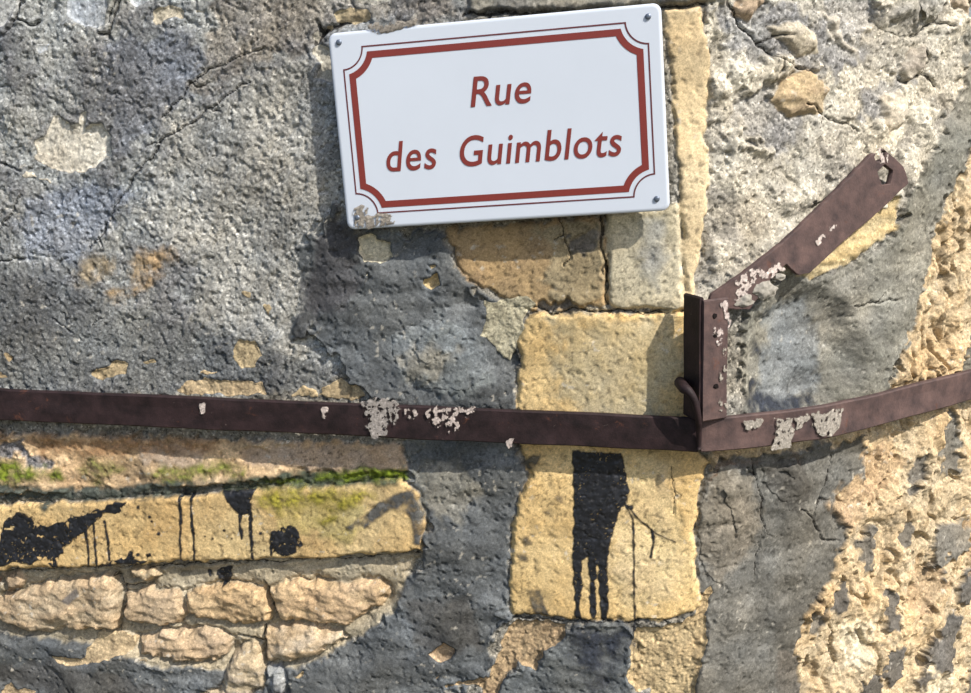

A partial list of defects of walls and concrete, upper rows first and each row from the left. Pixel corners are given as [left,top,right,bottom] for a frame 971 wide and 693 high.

crack [3,0,41,37]
crack [98,0,121,40]
spalling [23,111,112,183]
crack [90,48,263,250]
peeling [735,262,785,301]
spalling [480,296,536,360]
spalling [52,628,140,666]
spalling [429,643,455,662]
spalling [436,619,565,693]
spalling [626,586,713,693]